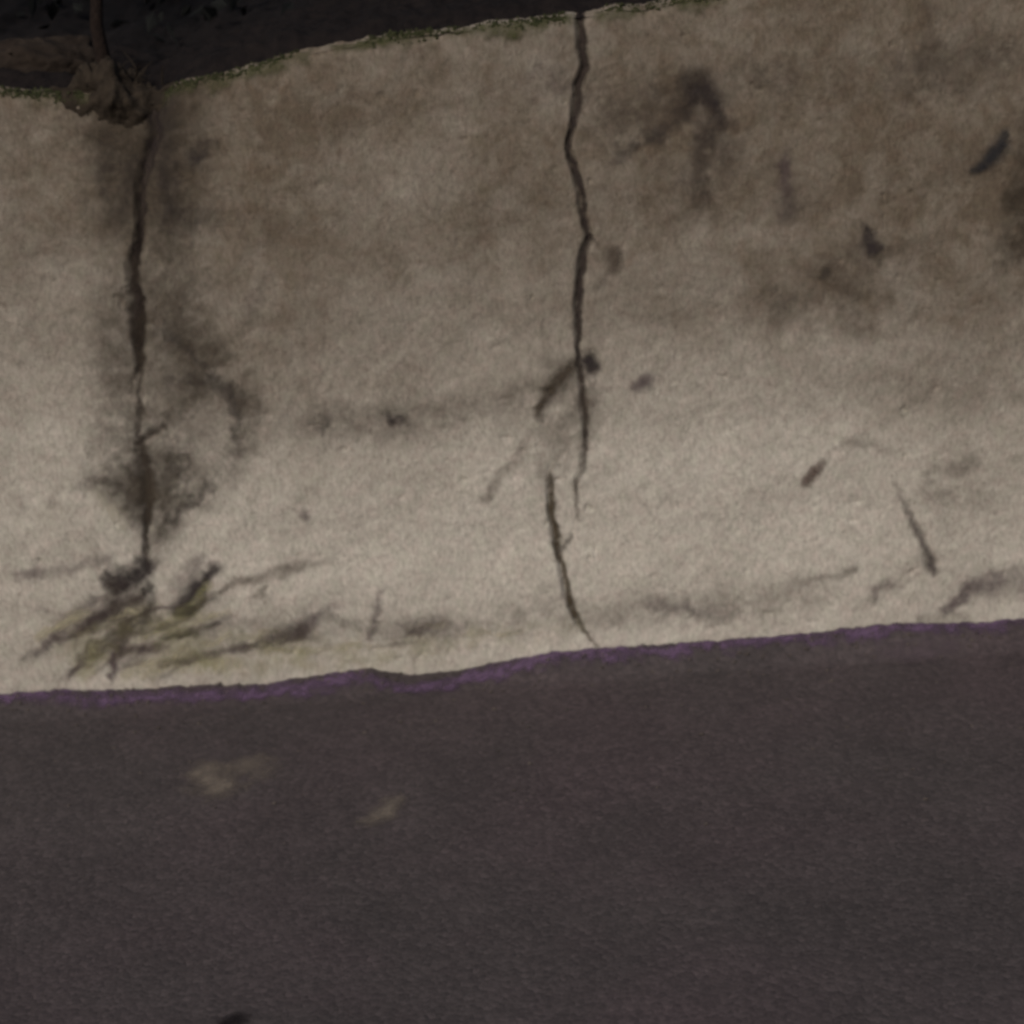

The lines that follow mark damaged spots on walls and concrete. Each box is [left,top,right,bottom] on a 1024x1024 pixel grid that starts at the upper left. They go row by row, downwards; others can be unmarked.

crack [129,110,163,373]
crack [548,12,591,636]
crack [136,407,157,574]
crack [910,519,936,574]